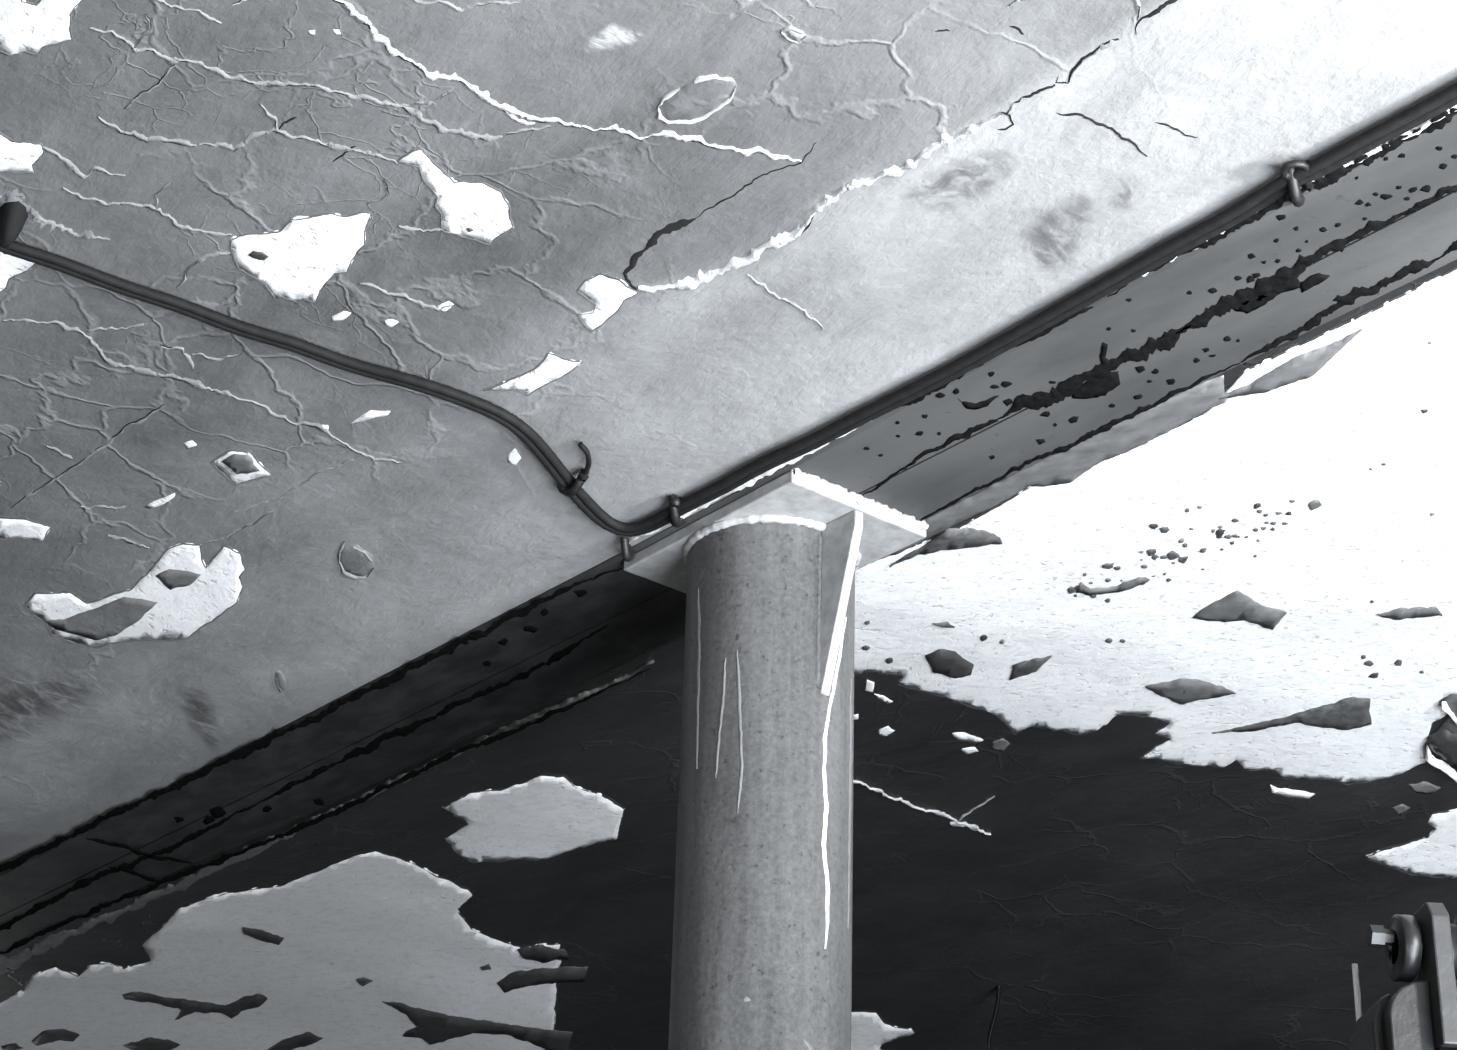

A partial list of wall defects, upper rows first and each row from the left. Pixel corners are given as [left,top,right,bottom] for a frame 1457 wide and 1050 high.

crack [44,146,232,288]
peeling [229,211,372,304]
crack [360,282,452,311]
crack [89,0,802,233]
peeling [398,148,514,246]
crack [623,0,1197,329]
crack [3,318,401,549]
peeling [24,543,247,648]
spalling [854,268,1457,815]
spalling [0,660,654,1050]
crack [853,780,995,836]
spalling [1365,809,1457,879]